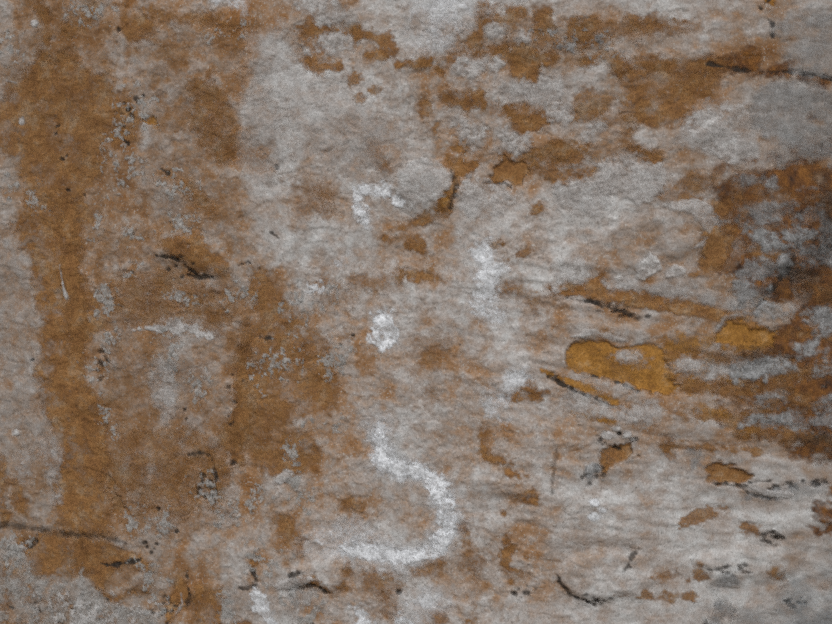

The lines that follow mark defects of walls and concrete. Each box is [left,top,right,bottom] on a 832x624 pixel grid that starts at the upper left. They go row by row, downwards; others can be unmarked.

rust [296,1,560,103]
rust [569,12,831,165]
crack [707,61,832,81]
rust [0,0,153,602]
rust [549,273,766,330]
rust [659,145,832,460]
spalling [566,329,680,395]
spalling [716,315,777,352]
spalling [586,438,639,484]
spalling [705,463,753,485]
rust [679,505,728,527]
rust [636,562,709,603]